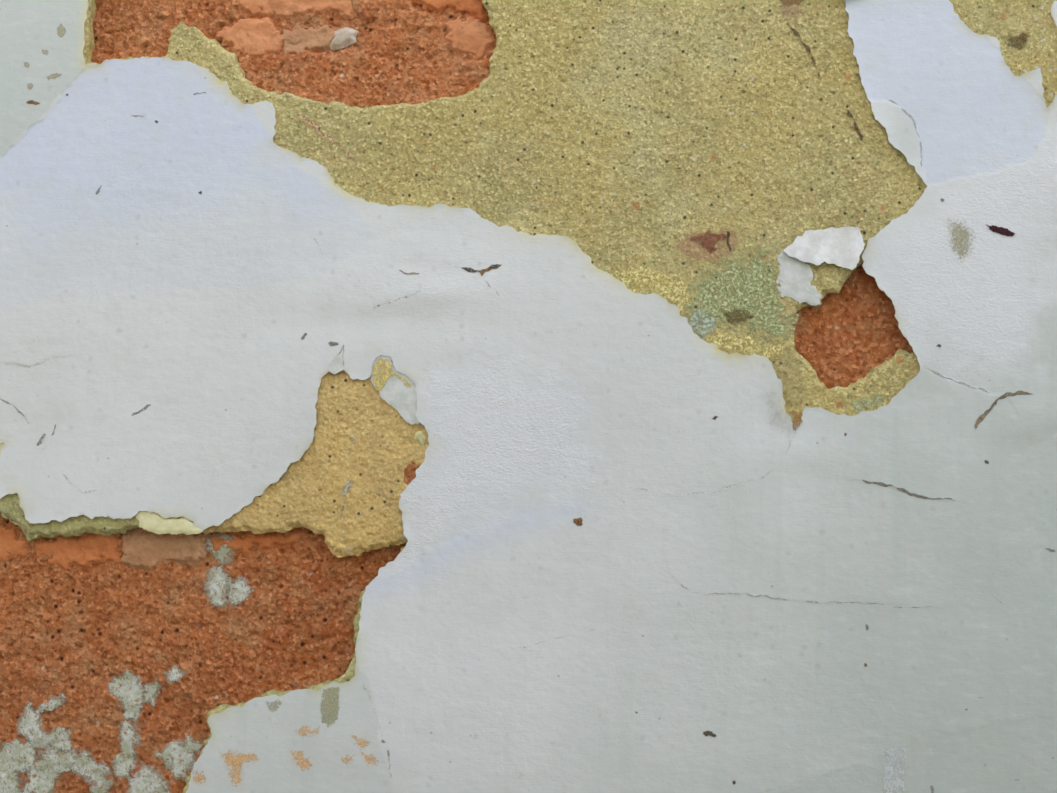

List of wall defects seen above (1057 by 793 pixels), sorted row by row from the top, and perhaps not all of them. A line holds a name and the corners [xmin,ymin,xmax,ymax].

flaking render [949,0,1057,108]
flaking render [83,0,927,424]
peeling [986,224,1015,236]
crack [863,480,951,499]
spalling [0,355,429,793]